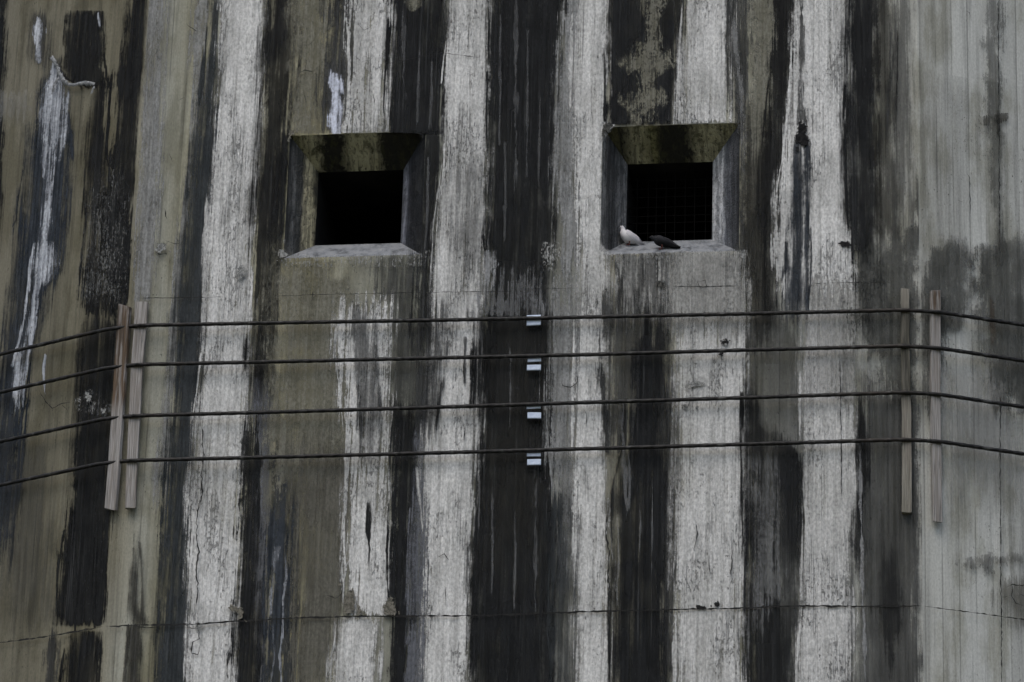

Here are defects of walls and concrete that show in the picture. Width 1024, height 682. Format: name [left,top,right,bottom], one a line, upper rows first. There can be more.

leakage [0,0,169,682]
leakage [152,0,923,682]
leakage [921,238,1024,419]